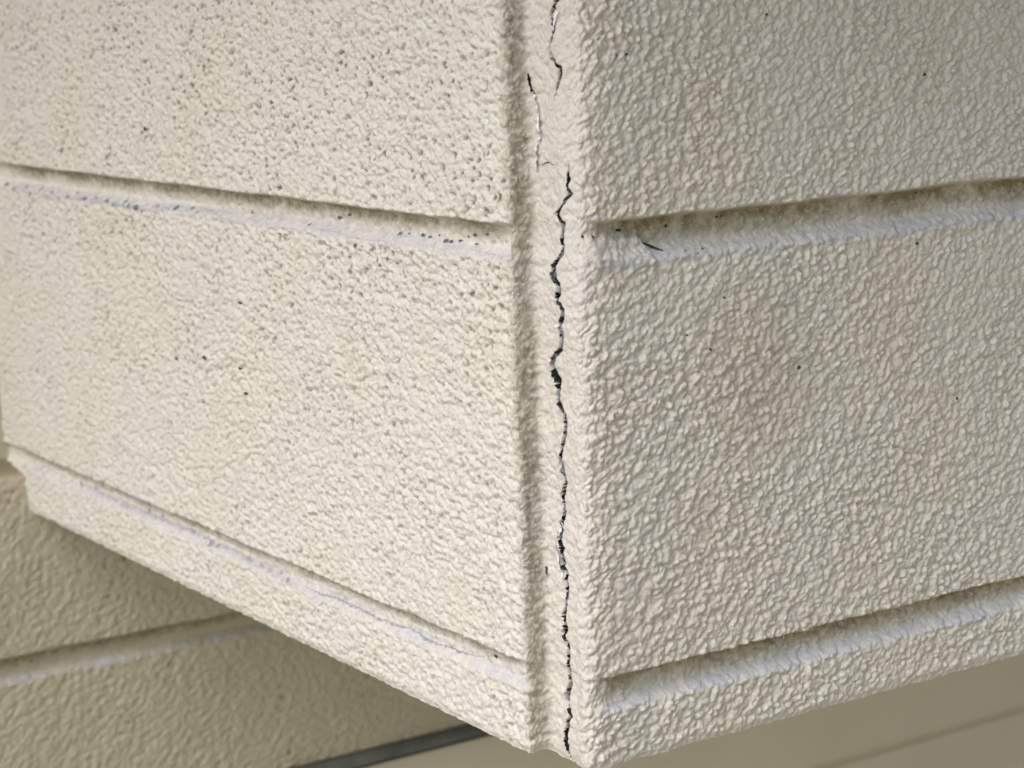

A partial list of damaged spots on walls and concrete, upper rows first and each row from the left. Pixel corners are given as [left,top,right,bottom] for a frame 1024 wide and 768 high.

crack [550,0,562,101]
crack [547,171,573,757]